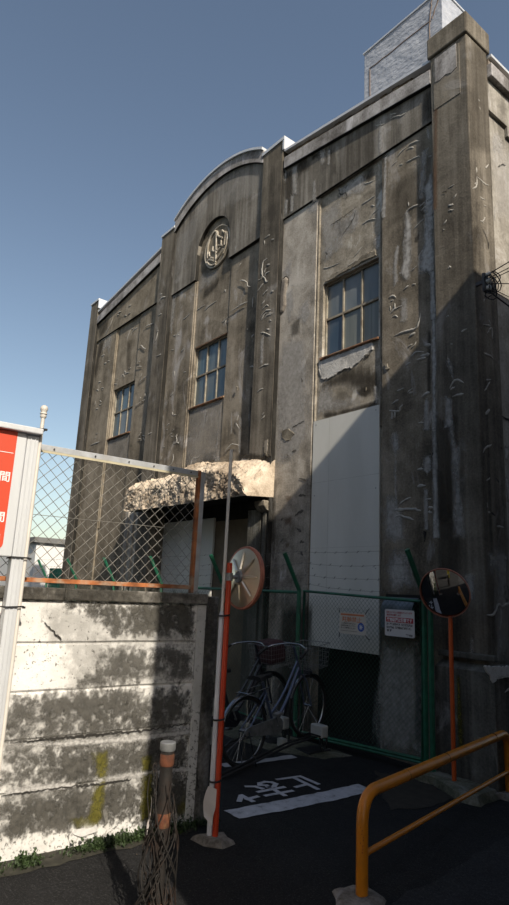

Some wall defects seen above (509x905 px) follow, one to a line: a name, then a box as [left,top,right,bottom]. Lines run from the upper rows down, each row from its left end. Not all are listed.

water stain [318,369,377,417]
water stain [57,587,215,711]
peeling [483,665,509,683]
water stain [0,648,191,840]